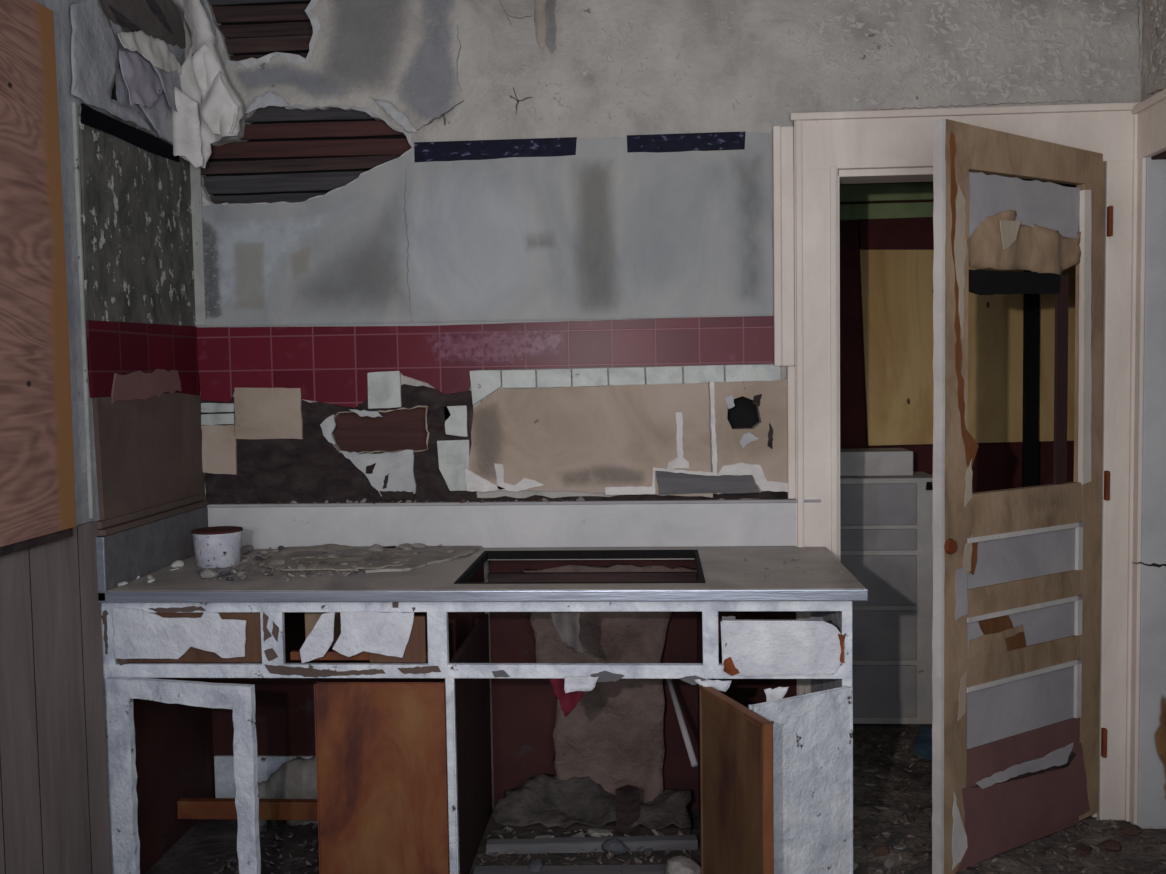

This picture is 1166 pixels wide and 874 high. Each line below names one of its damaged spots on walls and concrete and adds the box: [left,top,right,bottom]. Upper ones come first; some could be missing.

flaking render [70,0,186,144]
spalling [201,0,321,68]
spalling [201,91,418,206]
spalling [111,369,182,404]
peeling [201,384,788,504]
crack [1132,561,1166,569]
rust [1155,698,1166,791]